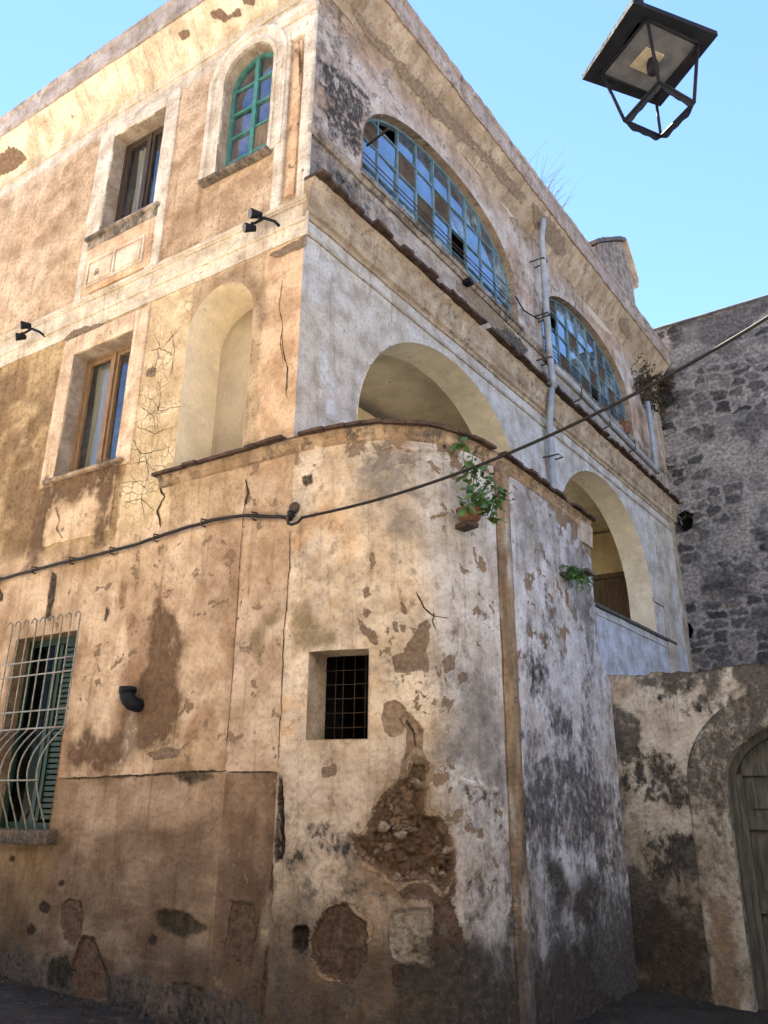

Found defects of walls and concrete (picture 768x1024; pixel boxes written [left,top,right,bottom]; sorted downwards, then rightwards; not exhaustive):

leakage [317,59,369,157]
crack [279,279,289,400]
crack [123,329,179,527]
leakage [67,601,182,772]
flaking render [392,601,431,673]
crack [416,592,447,629]
leakage [520,706,608,862]
leakage [619,747,690,815]
spalling [348,700,464,978]
leakage [641,828,693,884]
flaking render [39,898,110,1002]
spalling [292,901,374,985]